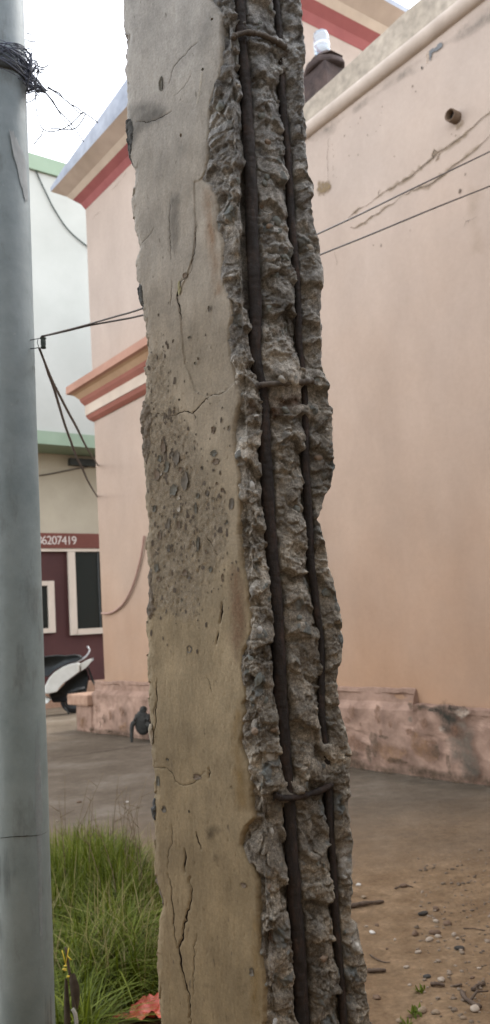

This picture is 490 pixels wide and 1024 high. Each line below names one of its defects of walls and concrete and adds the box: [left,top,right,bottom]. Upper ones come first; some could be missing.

crack [352,112,490,228]
crack [141,205,198,320]
spalling [140,0,372,1024]
damp [346,703,490,788]
crack [167,831,201,1022]